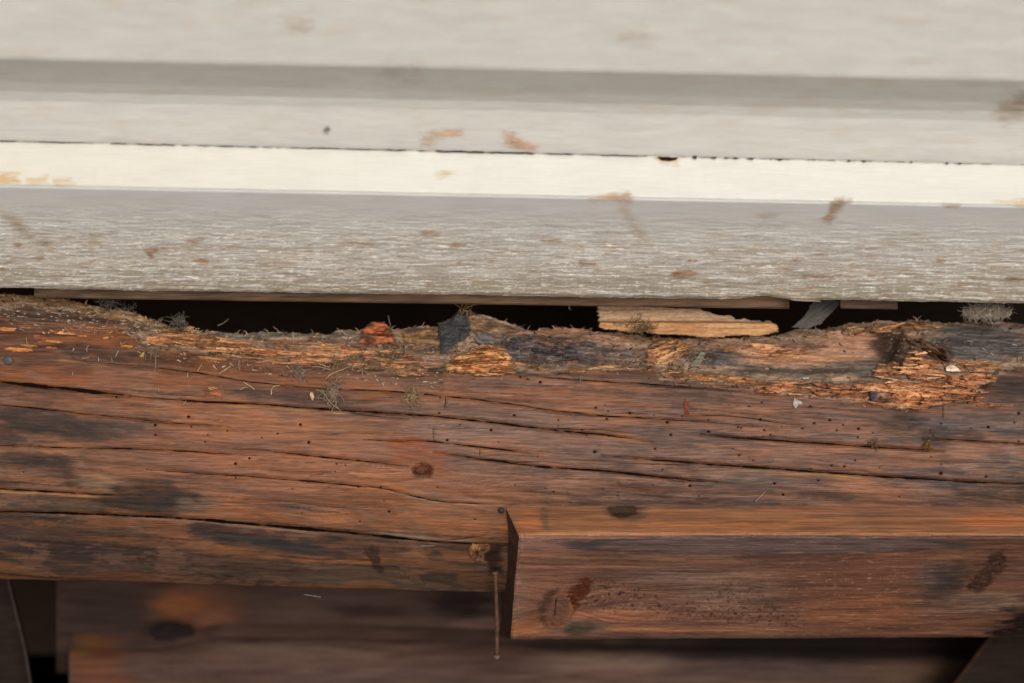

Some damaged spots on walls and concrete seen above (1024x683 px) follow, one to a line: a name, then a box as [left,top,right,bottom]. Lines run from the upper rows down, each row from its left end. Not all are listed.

peeling [4,331,87,352]
peeling [155,331,285,363]
peeling [424,337,607,376]
peeling [648,339,713,381]
peeling [831,321,1002,410]
peeling [729,376,808,409]
crack [0,358,1022,504]
crack [0,488,485,544]